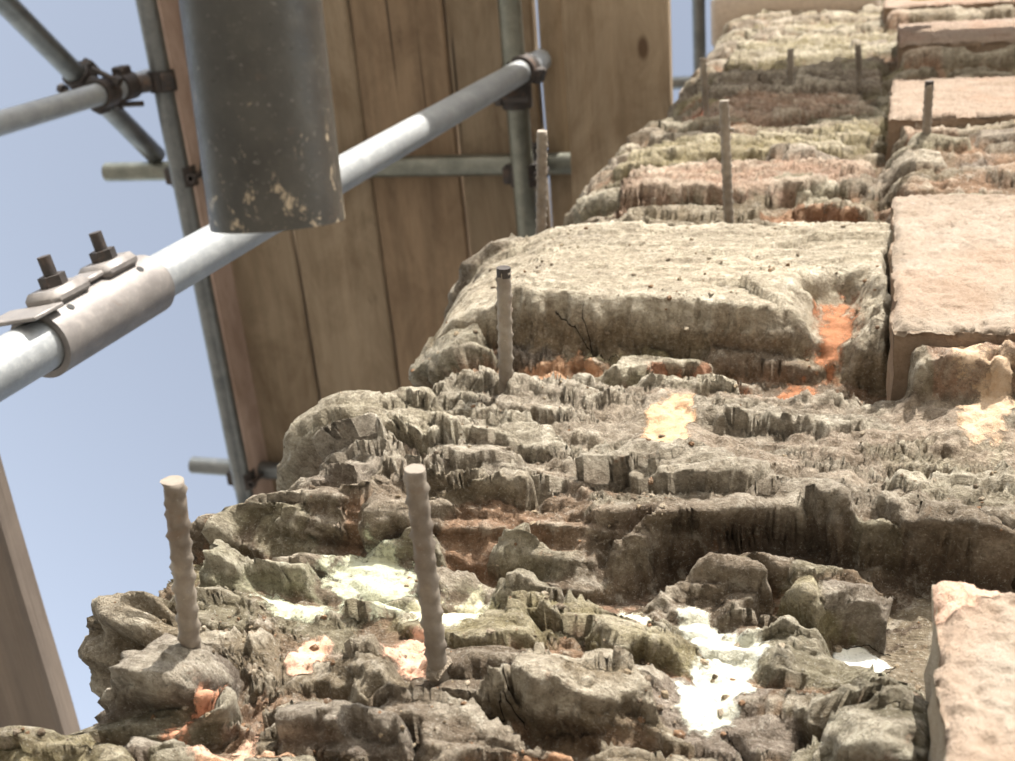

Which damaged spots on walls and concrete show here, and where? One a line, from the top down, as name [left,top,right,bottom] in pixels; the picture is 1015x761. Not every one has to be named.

spalling [759,201,865,223]
corrosion [804,294,864,385]
corrosion [777,376,816,400]
corrosion [640,393,697,442]
leakage [250,530,422,623]
leakage [440,585,499,626]
spalling [932,581,1003,625]
spalling [283,635,334,676]
spalling [380,626,428,680]
leakage [674,606,771,736]
peeling [833,646,892,673]
spalling [161,685,296,761]